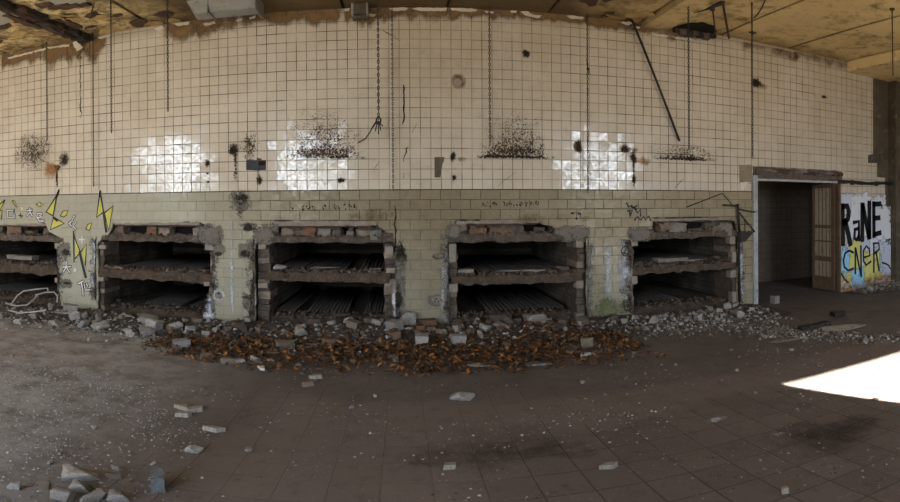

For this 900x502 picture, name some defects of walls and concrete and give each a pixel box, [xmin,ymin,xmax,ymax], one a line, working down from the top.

flaking render [0,0,189,59]
flaking render [579,0,658,29]
spalling [650,22,717,41]
spalling [197,223,225,316]
spalling [229,191,279,316]
spalling [554,212,593,317]